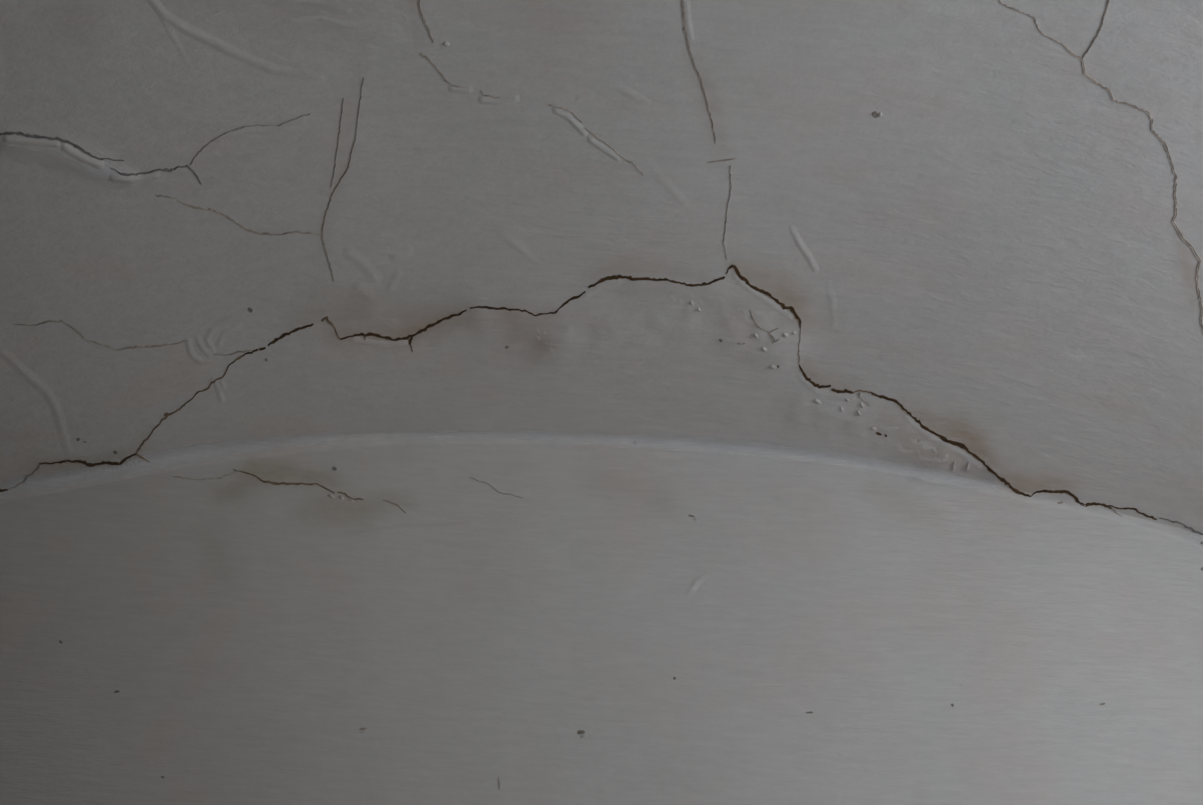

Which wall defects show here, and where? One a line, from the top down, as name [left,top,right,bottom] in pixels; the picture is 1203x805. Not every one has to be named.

crack [0,0,1203,535]